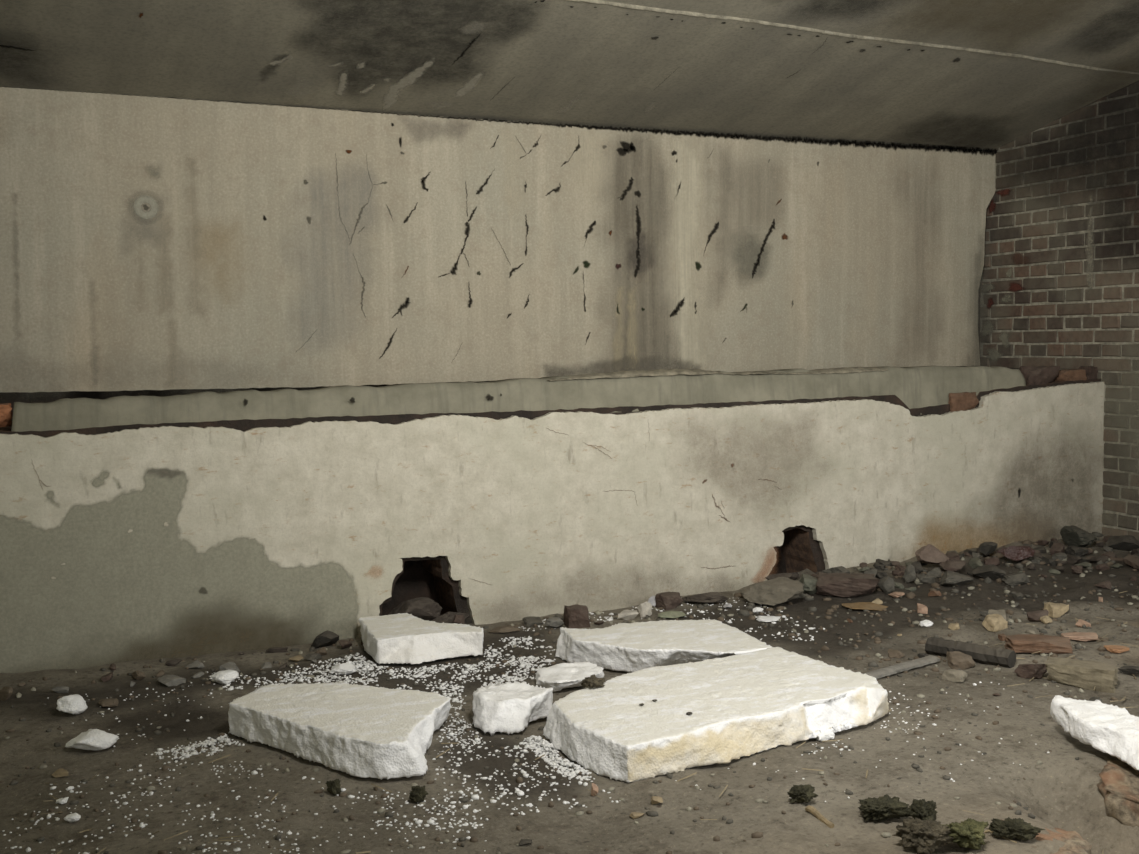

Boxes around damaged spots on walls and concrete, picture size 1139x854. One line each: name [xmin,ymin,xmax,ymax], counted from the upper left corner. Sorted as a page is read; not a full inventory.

leakage [361,61,433,110]
crack [335,153,430,359]
crack [439,135,580,318]
crack [584,221,596,246]
leakage [548,143,700,377]
crack [619,177,641,278]
crack [670,297,697,317]
crack [704,222,719,253]
crack [741,199,782,312]
peeling [0,469,359,673]